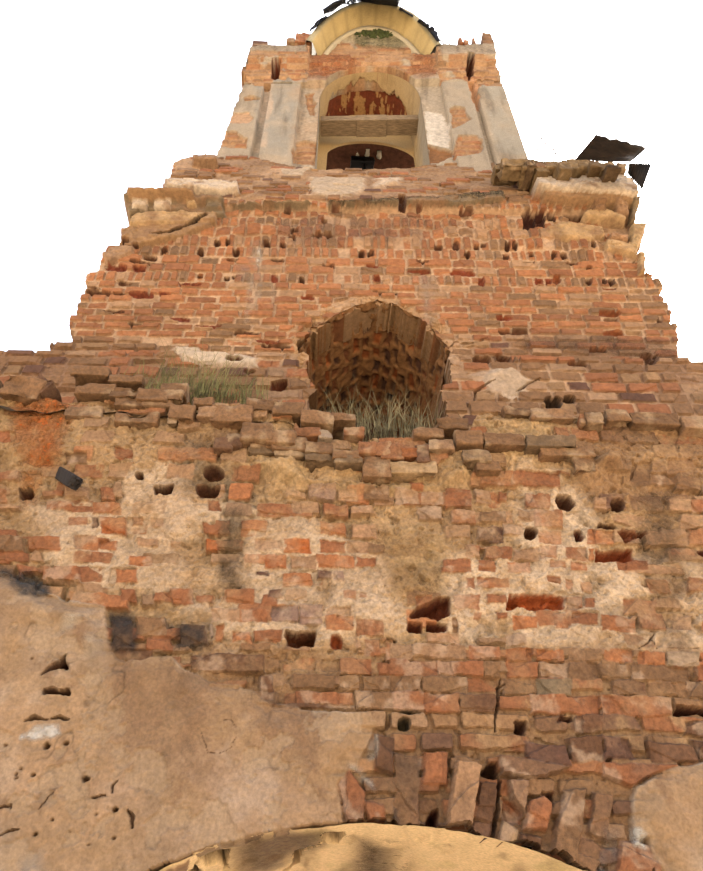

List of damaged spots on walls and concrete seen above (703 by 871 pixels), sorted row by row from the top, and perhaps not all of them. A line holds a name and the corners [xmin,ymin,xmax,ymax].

spalling [305,80,407,116]
spalling [424,51,484,164]
spalling [195,464,226,499]
spalling [555,493,577,512]
spalling [595,497,649,563]
damp [110,614,137,651]
damp [177,625,204,651]
spalling [406,595,452,634]
spalling [506,592,566,611]
crack [494,677,506,733]
peeling [0,586,378,871]
peeling [627,760,703,871]